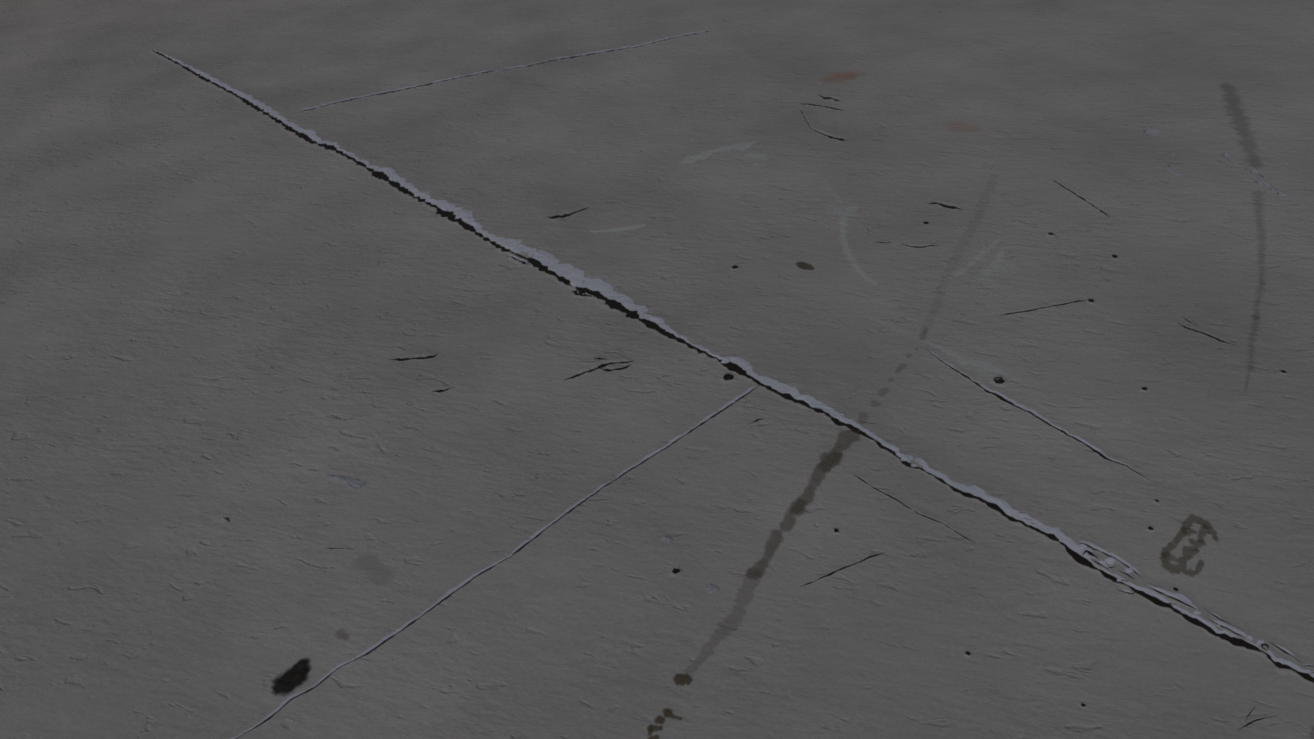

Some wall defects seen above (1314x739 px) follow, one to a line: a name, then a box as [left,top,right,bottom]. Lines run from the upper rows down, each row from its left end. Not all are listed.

crack [151,29,1314,686]
crack [1237,707,1277,730]